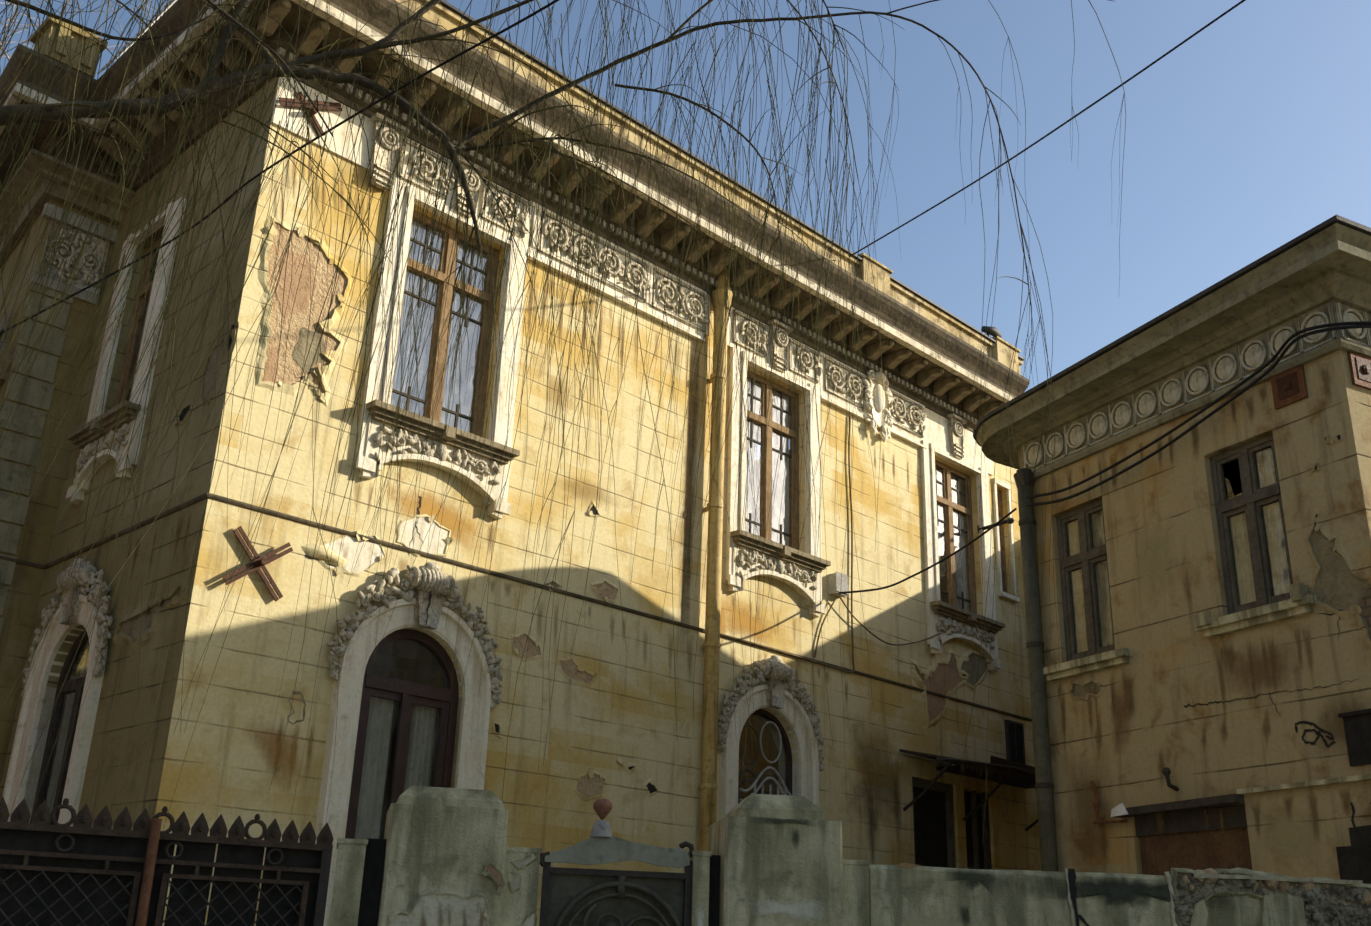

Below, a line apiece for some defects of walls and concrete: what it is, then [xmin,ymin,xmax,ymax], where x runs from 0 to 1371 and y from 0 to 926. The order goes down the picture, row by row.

flaking render [255,215,353,407]
water stain [684,383,697,585]
peeling [317,514,454,577]
flaking render [590,578,620,604]
flaking render [1304,516,1371,652]
flaking render [510,631,598,687]
flaking render [908,648,991,729]
crack [1184,679,1358,717]
spalling [1170,867,1371,926]